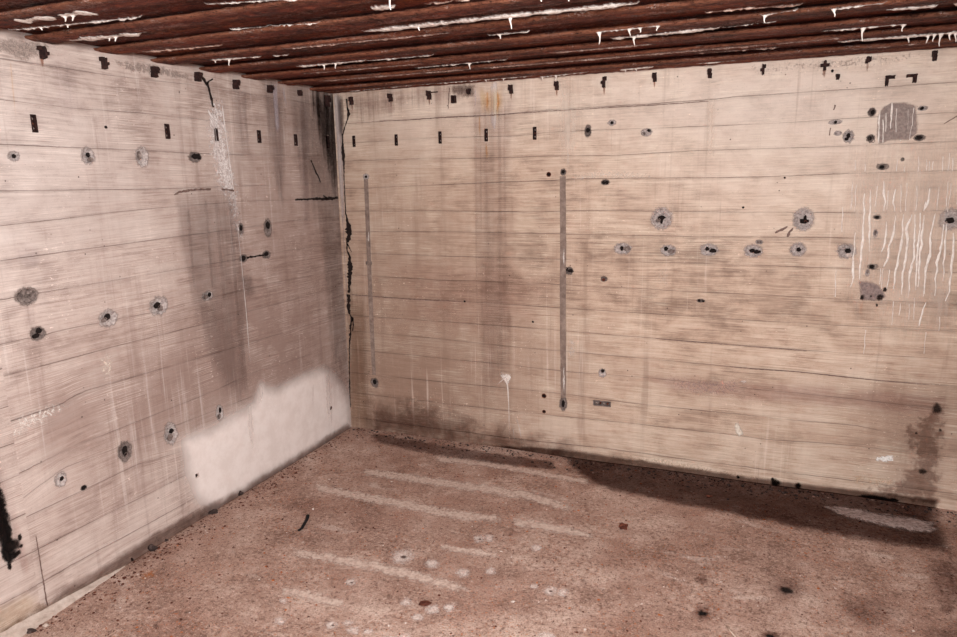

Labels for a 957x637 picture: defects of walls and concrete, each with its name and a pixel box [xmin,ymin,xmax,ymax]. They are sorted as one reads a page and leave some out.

leakage [14,10,141,30]
leakage [70,32,143,42]
leakage [275,0,639,57]
leakage [708,3,803,23]
leakage [831,3,939,17]
leakage [297,24,957,126]
leakage [206,103,249,344]
crack [295,99,463,407]
leakage [496,421,935,508]
leakage [830,507,933,532]